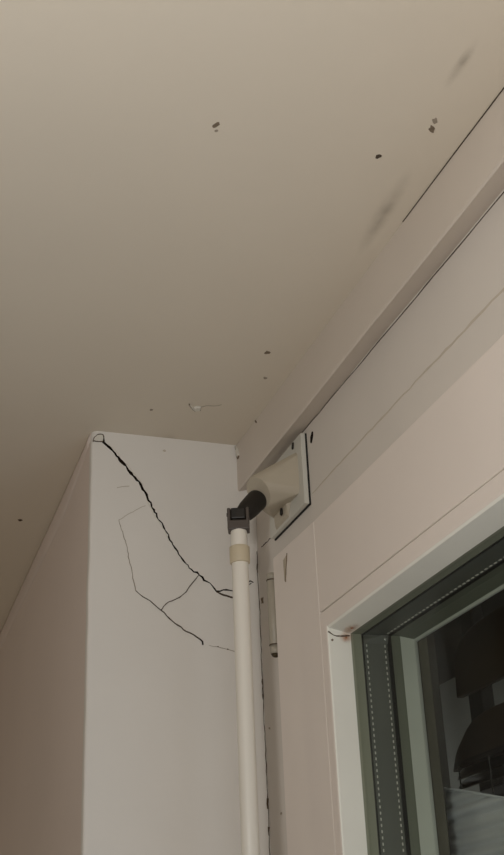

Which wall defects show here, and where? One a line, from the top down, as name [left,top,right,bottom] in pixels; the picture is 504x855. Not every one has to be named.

crack [102,437,270,854]